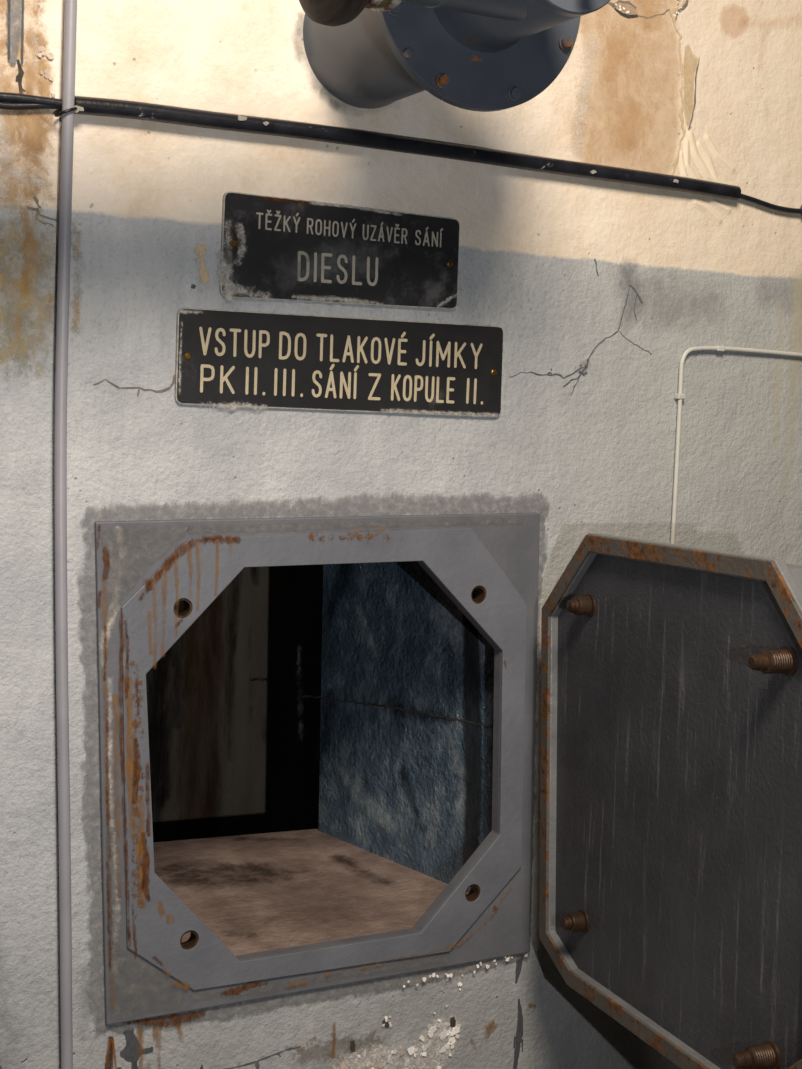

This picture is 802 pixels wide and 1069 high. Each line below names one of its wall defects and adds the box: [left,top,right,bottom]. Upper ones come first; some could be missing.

crack [607,2,670,19]
damp [0,28,56,202]
flaking render [670,0,700,175]
crack [510,284,652,395]
crack [93,374,175,396]
corrosion [97,526,109,610]
corrosion [140,535,240,602]
corrosion [103,616,169,956]
spalling [403,953,528,992]
corrosion [105,1036,116,1069]
peeling [333,1005,461,1069]